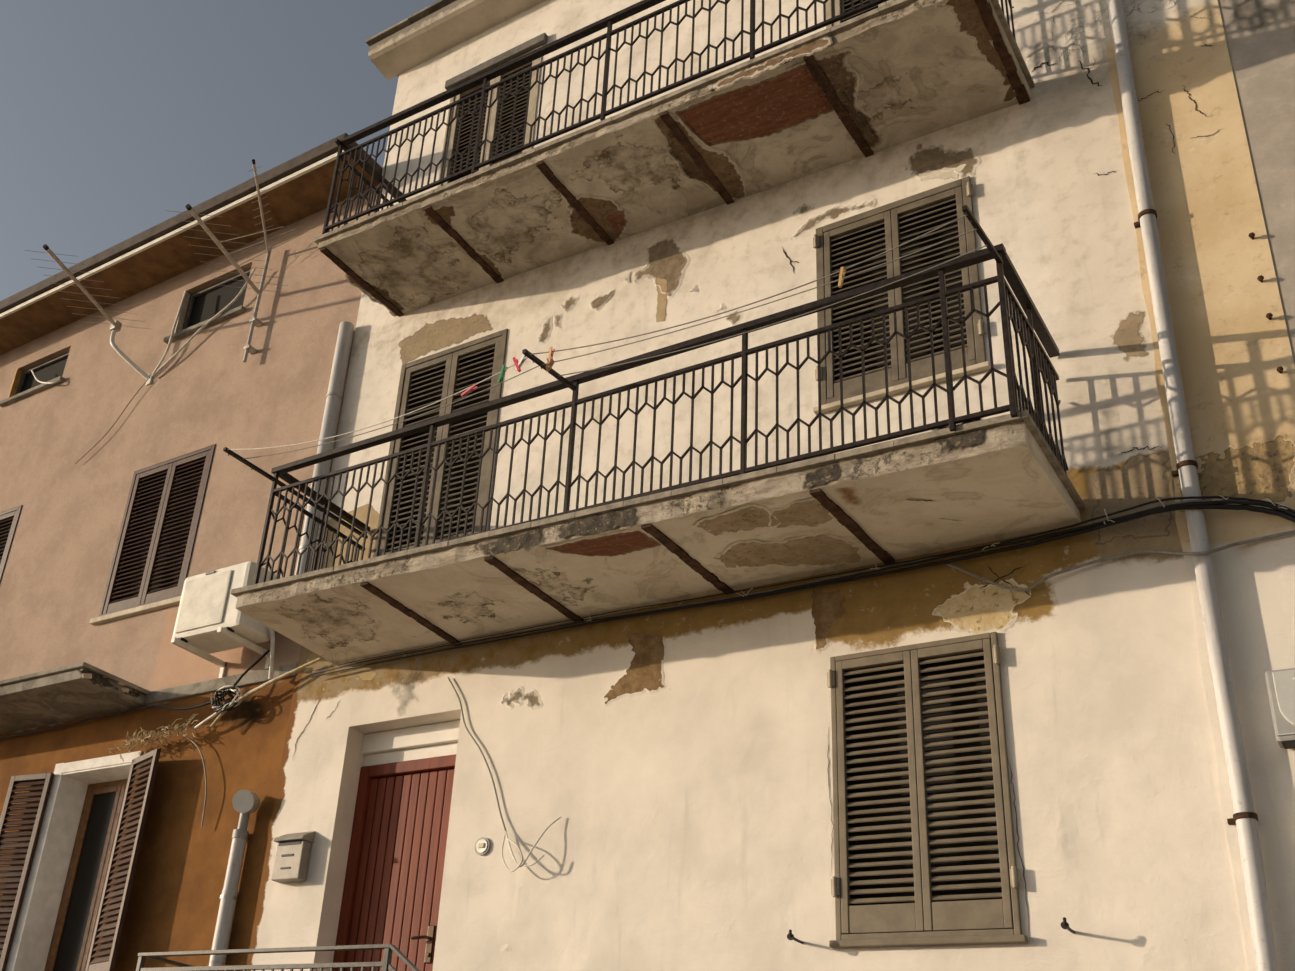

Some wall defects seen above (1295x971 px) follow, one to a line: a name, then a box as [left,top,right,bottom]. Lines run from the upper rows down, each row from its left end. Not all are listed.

flaking render [648,36,885,200]